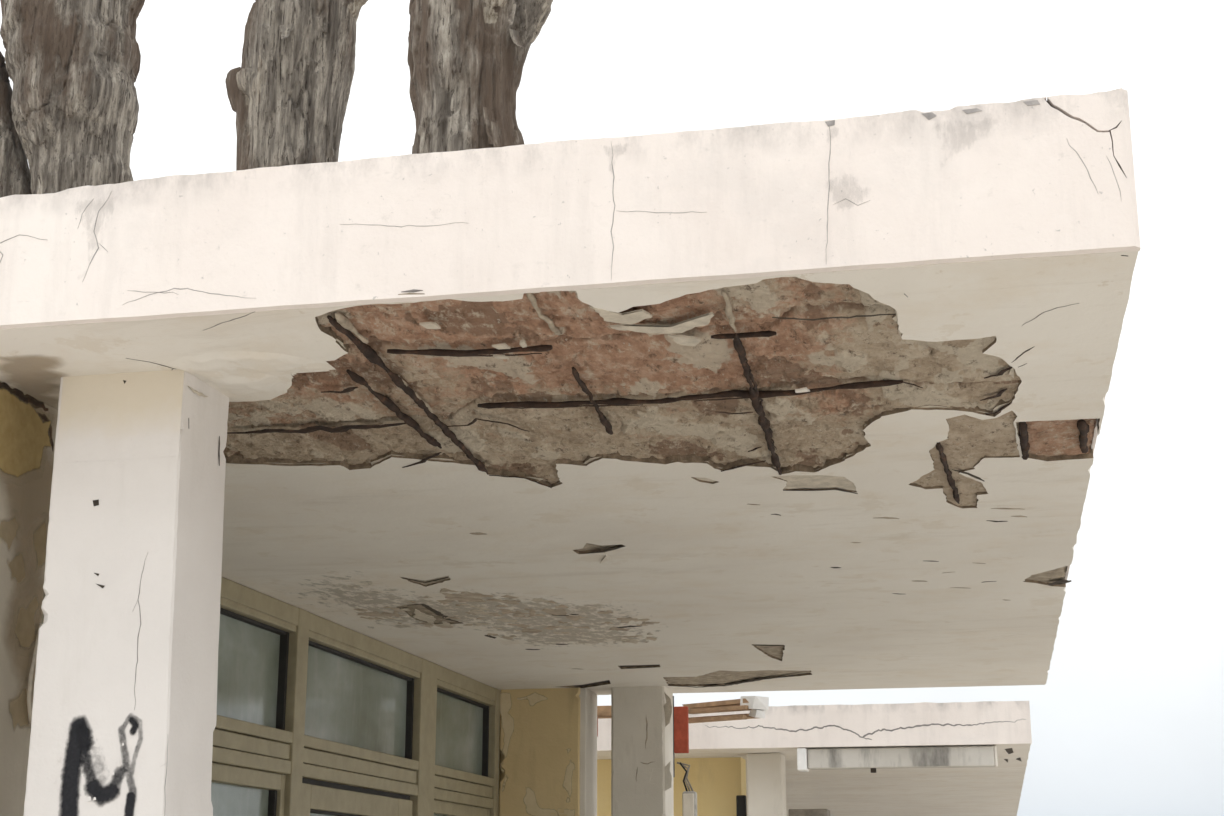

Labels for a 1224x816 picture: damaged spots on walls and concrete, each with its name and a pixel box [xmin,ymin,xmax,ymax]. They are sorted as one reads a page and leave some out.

crack [1067,120,1127,196]
crack [611,144,702,280]
crack [123,288,254,330]
peeling [0,389,51,477]
leakage [4,358,58,423]
spalling [218,277,1096,506]
peeling [0,518,47,582]
leakage [6,446,53,693]
crack [132,553,148,709]
peeling [10,689,28,728]
flaking render [620,644,810,727]
crack [705,719,1026,740]